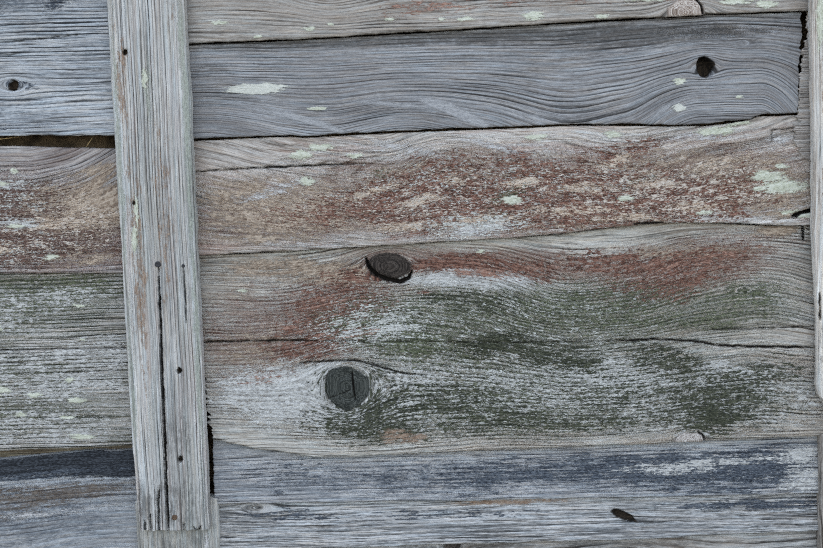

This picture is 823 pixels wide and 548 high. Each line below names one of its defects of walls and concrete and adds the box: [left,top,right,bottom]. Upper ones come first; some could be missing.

water stain [196,135,811,246]
water stain [208,254,380,286]
crack [204,339,418,399]
water stain [364,335,452,359]
water stain [497,288,613,304]
water stain [555,316,703,330]
crack [621,294,821,348]
water stain [705,281,792,303]
crack [144,268,201,531]
water stain [235,443,818,524]